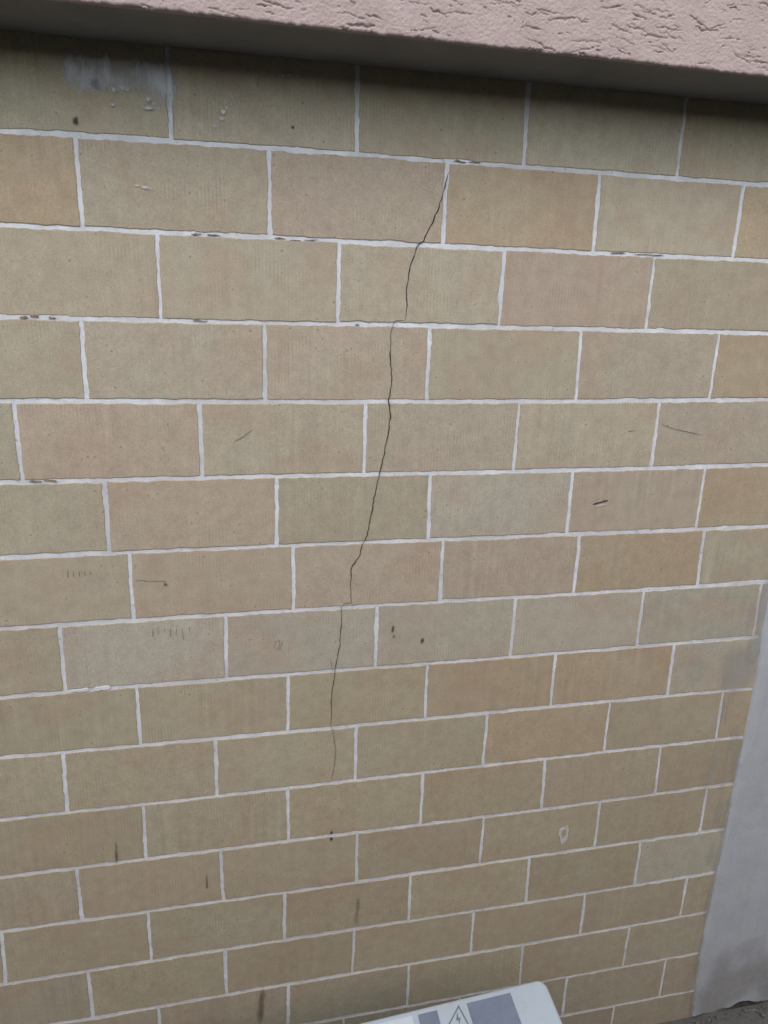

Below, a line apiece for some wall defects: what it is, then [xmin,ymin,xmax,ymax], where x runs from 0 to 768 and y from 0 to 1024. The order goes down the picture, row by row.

crack [330,173,449,780]